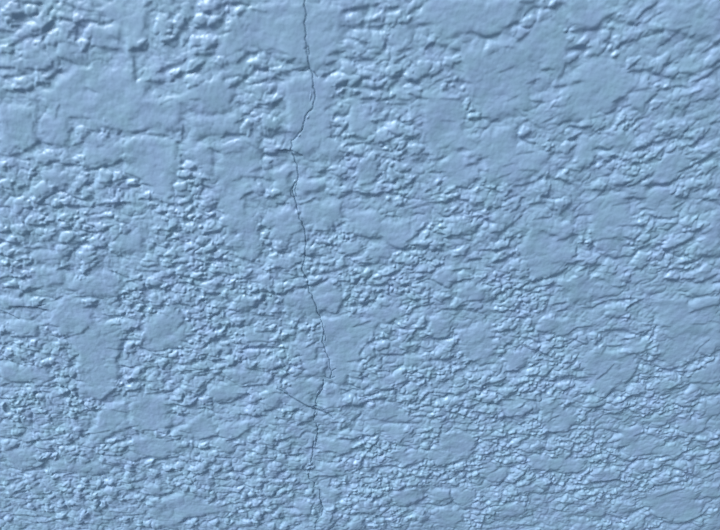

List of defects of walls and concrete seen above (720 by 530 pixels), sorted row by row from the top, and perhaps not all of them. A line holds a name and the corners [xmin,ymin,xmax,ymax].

crack [278,1,333,529]